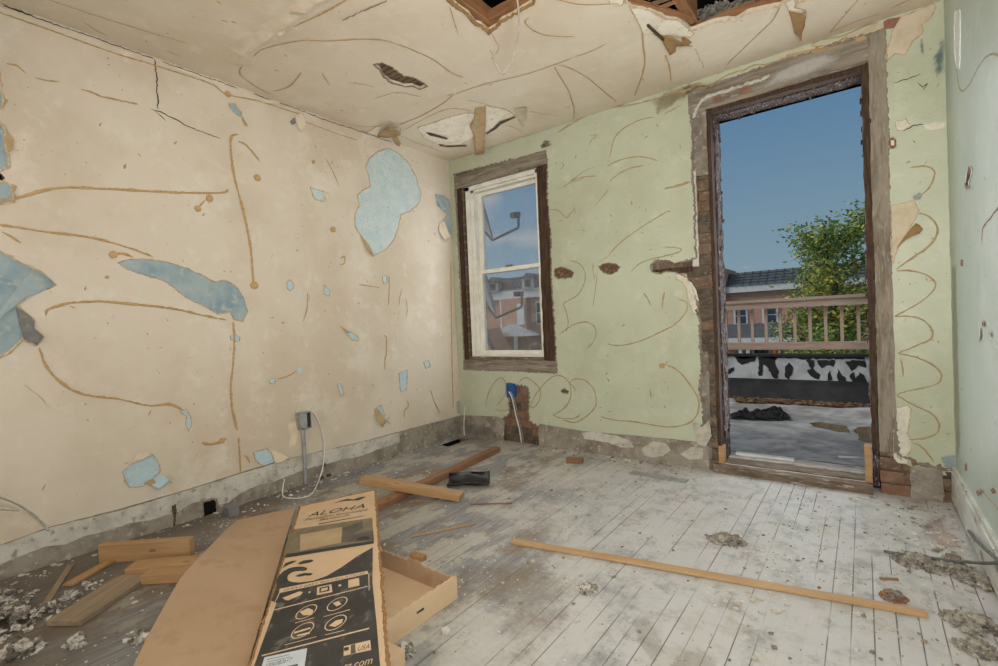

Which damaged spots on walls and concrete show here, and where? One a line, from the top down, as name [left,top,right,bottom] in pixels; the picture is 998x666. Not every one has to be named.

crack [4,5,390,142]
flaking render [373,62,429,90]
peeling [608,0,695,55]
peeling [704,0,937,154]
peeling [0,250,57,359]
peeling [117,258,248,322]
peeling [354,122,422,257]
peeling [418,105,574,428]
peeling [582,97,712,460]
peeling [889,199,923,274]
peeling [0,405,400,564]
peeling [892,405,953,471]